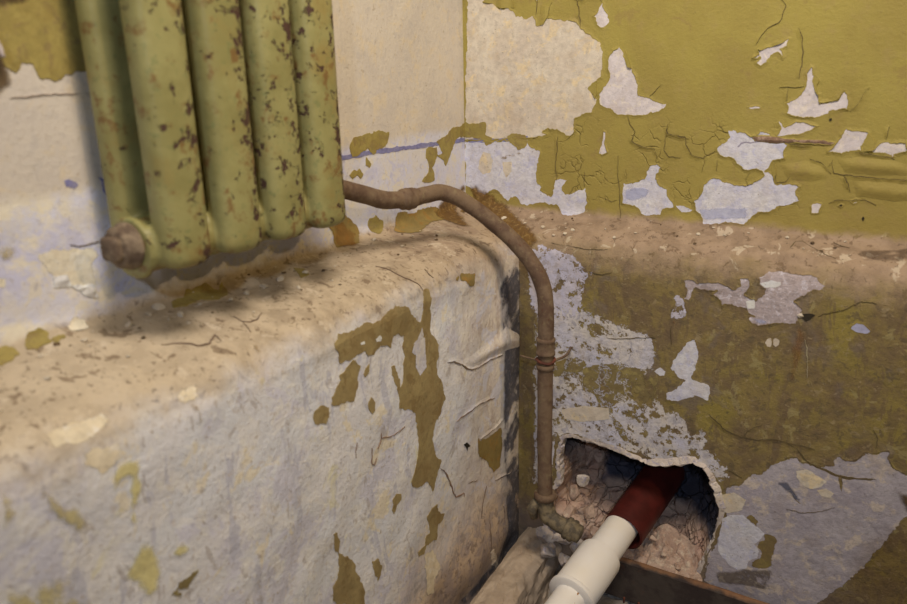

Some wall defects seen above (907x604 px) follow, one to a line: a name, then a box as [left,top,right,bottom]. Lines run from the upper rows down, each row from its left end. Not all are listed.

peeling [750,35,793,69]
peeling [464,0,669,217]
crack [603,117,727,219]
peeling [620,64,907,227]
crack [746,124,907,209]
peeling [38,248,99,297]
peeling [0,345,20,366]
peeling [47,413,125,474]
peeling [412,328,427,376]
peeling [527,275,538,484]
peeling [532,245,907,604]
crack [707,414,876,513]